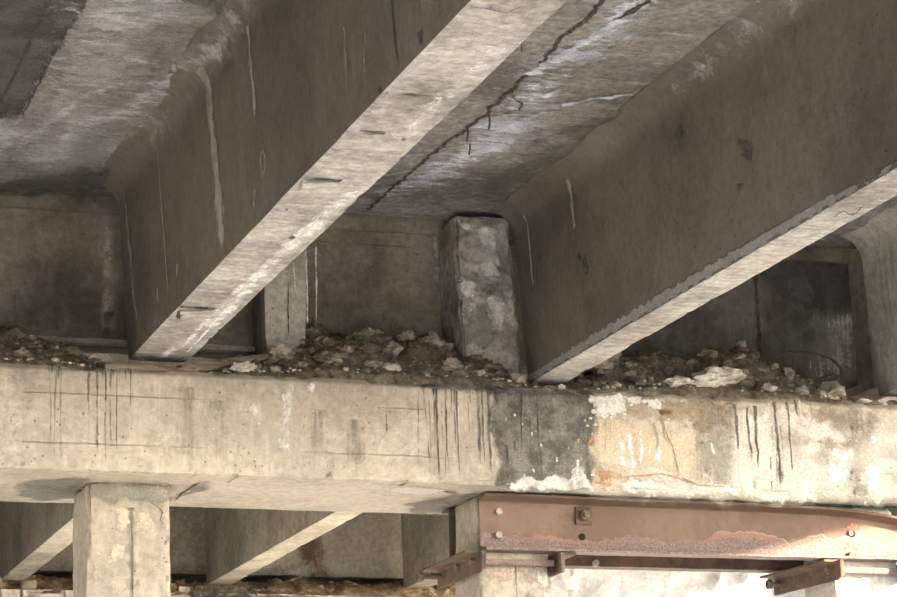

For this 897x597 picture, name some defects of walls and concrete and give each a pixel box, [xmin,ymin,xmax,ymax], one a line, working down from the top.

water stain [0,0,256,309]
crack [367,0,651,210]
water stain [87,369,118,457]
water stain [418,382,897,503]
spalling [583,393,753,497]